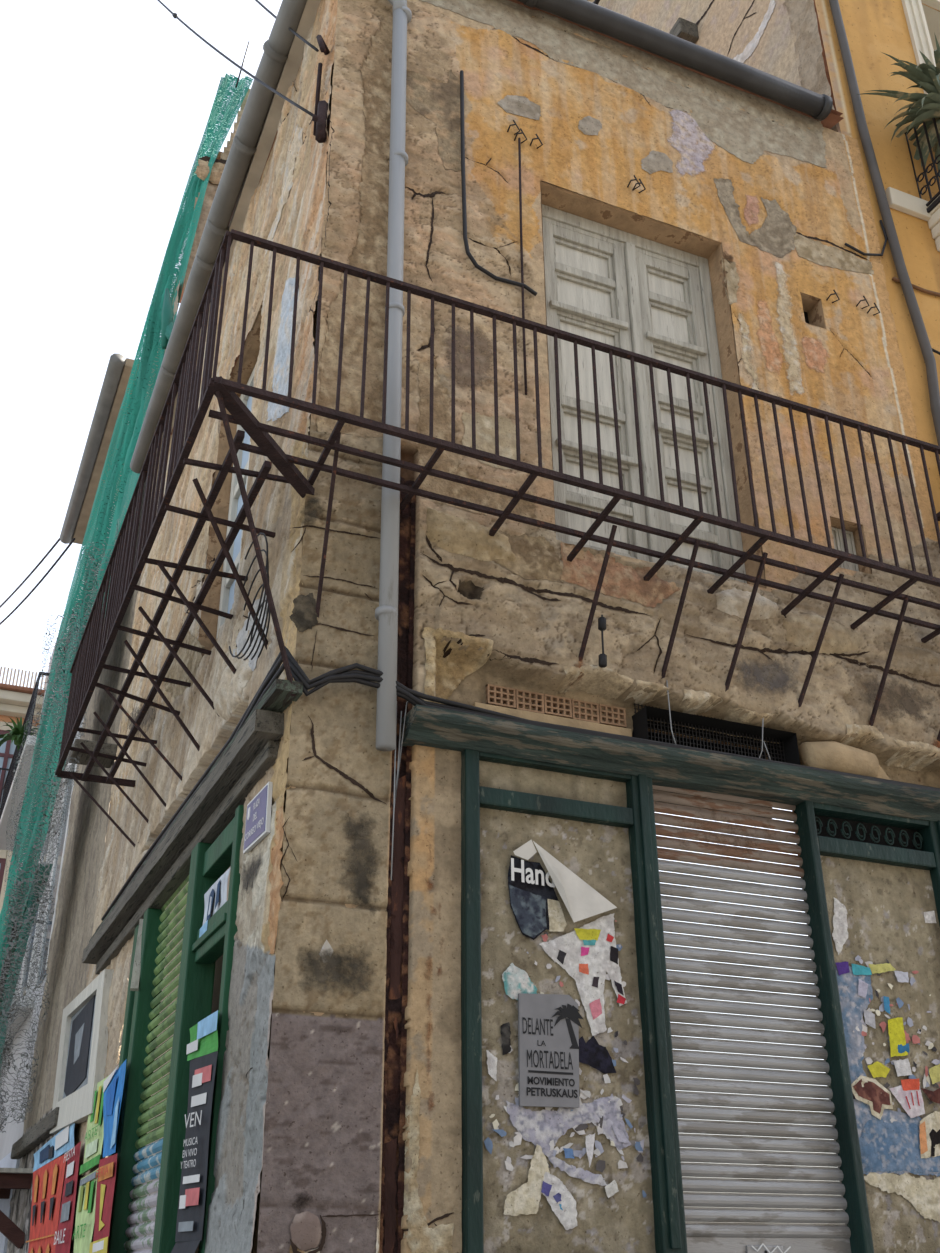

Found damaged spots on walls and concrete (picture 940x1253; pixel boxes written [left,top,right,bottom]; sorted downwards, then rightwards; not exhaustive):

peeling [421,0,874,274]
crack [406,187,446,281]
crack [469,238,517,275]
crack [420,536,940,687]
spalling [422,627,493,704]
spalling [555,665,779,727]
crack [302,716,386,804]
spalling [841,724,940,771]
corrosion [389,775,406,999]
corrosion [383,1138,398,1253]